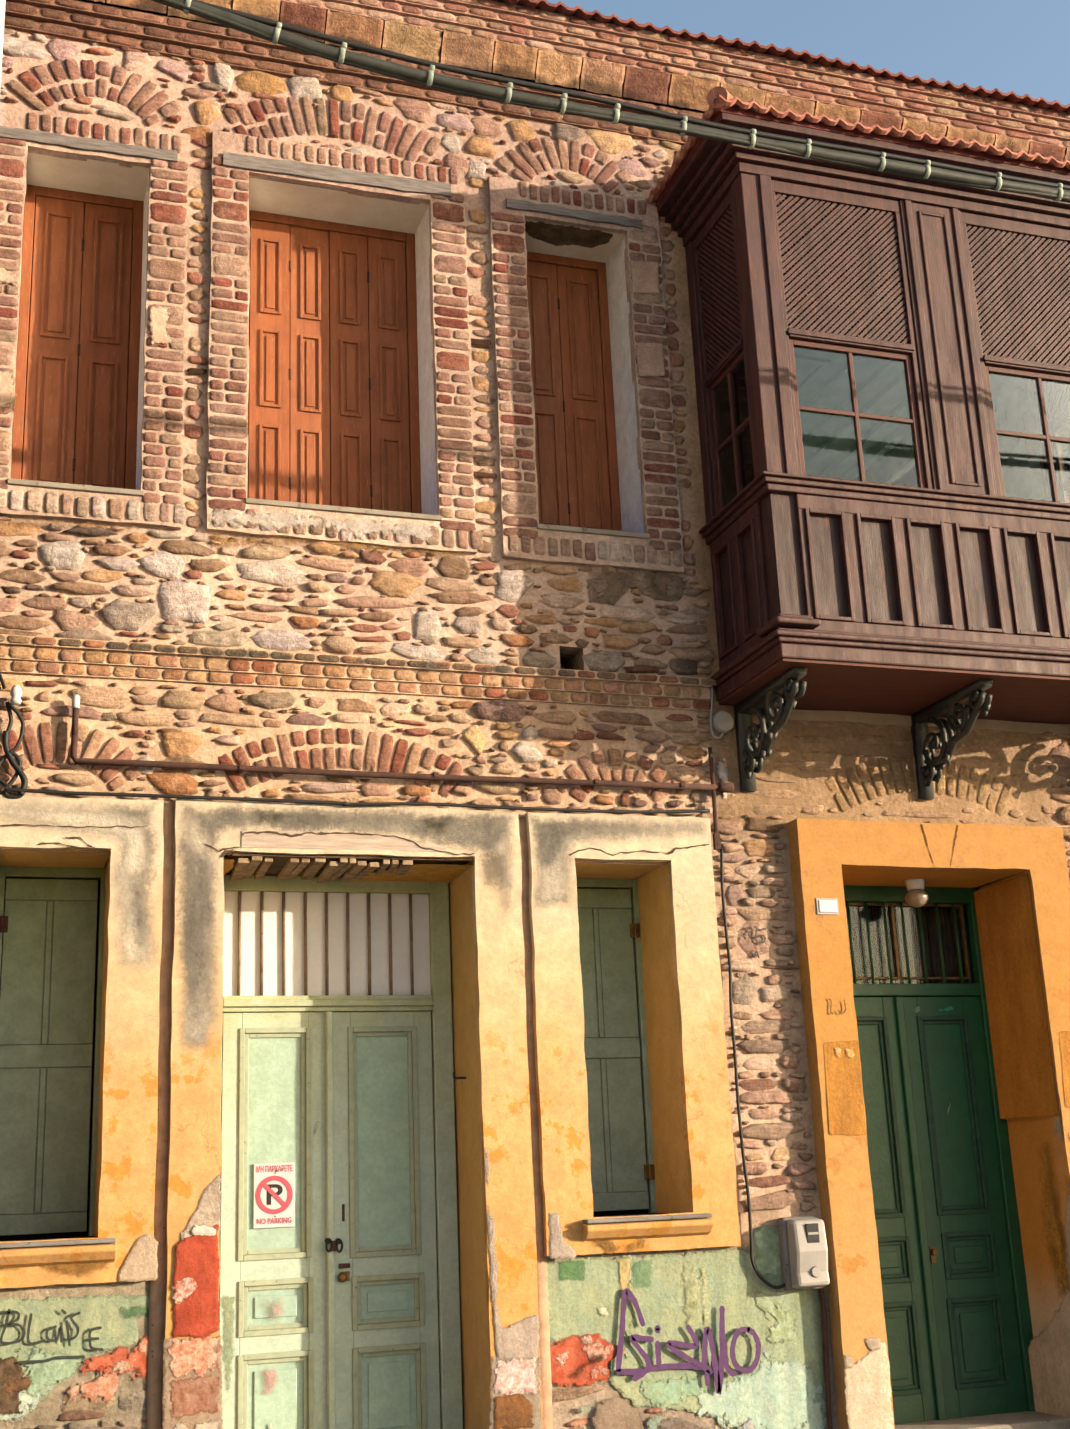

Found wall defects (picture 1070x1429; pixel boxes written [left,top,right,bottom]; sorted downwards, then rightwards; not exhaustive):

crack [0,824,146,849]
leakage [0,806,151,963]
leakage [182,810,511,1046]
leakage [536,820,703,904]
peeling [1053,1066,1070,1144]
peeling [0,1175,223,1429]
peeling [487,1205,827,1429]
peeling [844,1337,894,1429]
peeling [1028,1181,1070,1418]